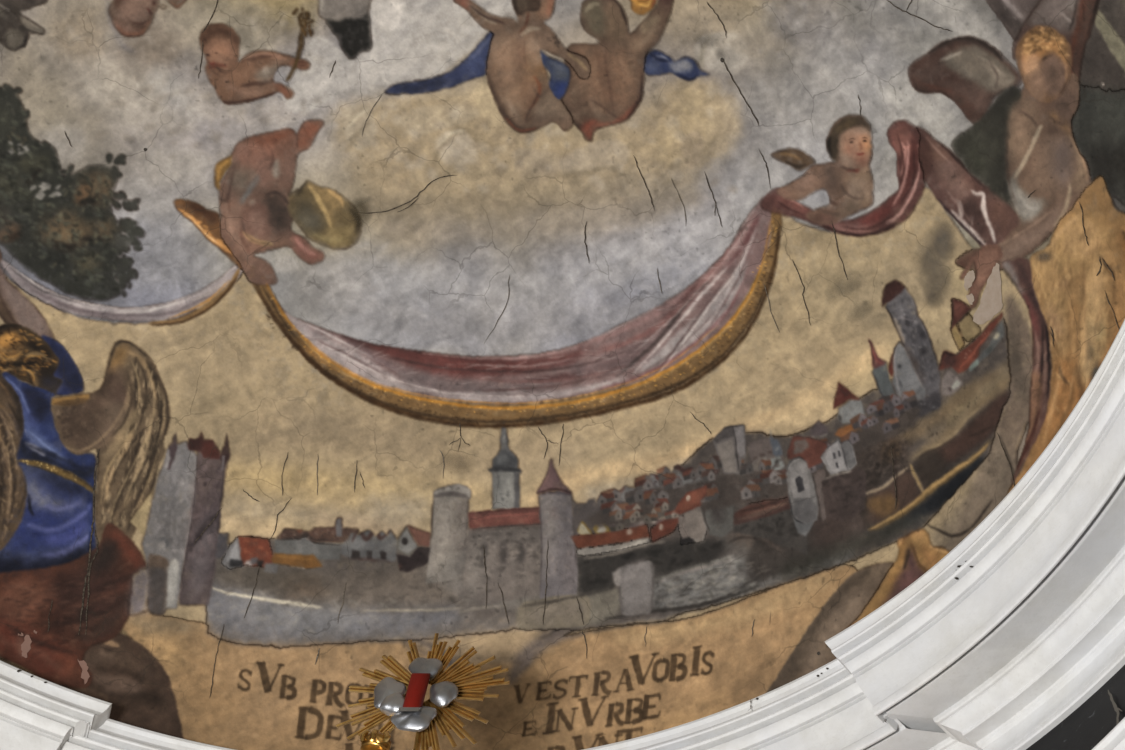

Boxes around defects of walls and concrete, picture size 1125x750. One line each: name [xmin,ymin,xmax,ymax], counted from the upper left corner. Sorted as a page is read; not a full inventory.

crack [887,0,953,32]
crack [707,2,770,184]
crack [633,155,686,220]
crack [243,454,291,536]
flaking render [17,630,47,683]
crack [209,564,260,698]